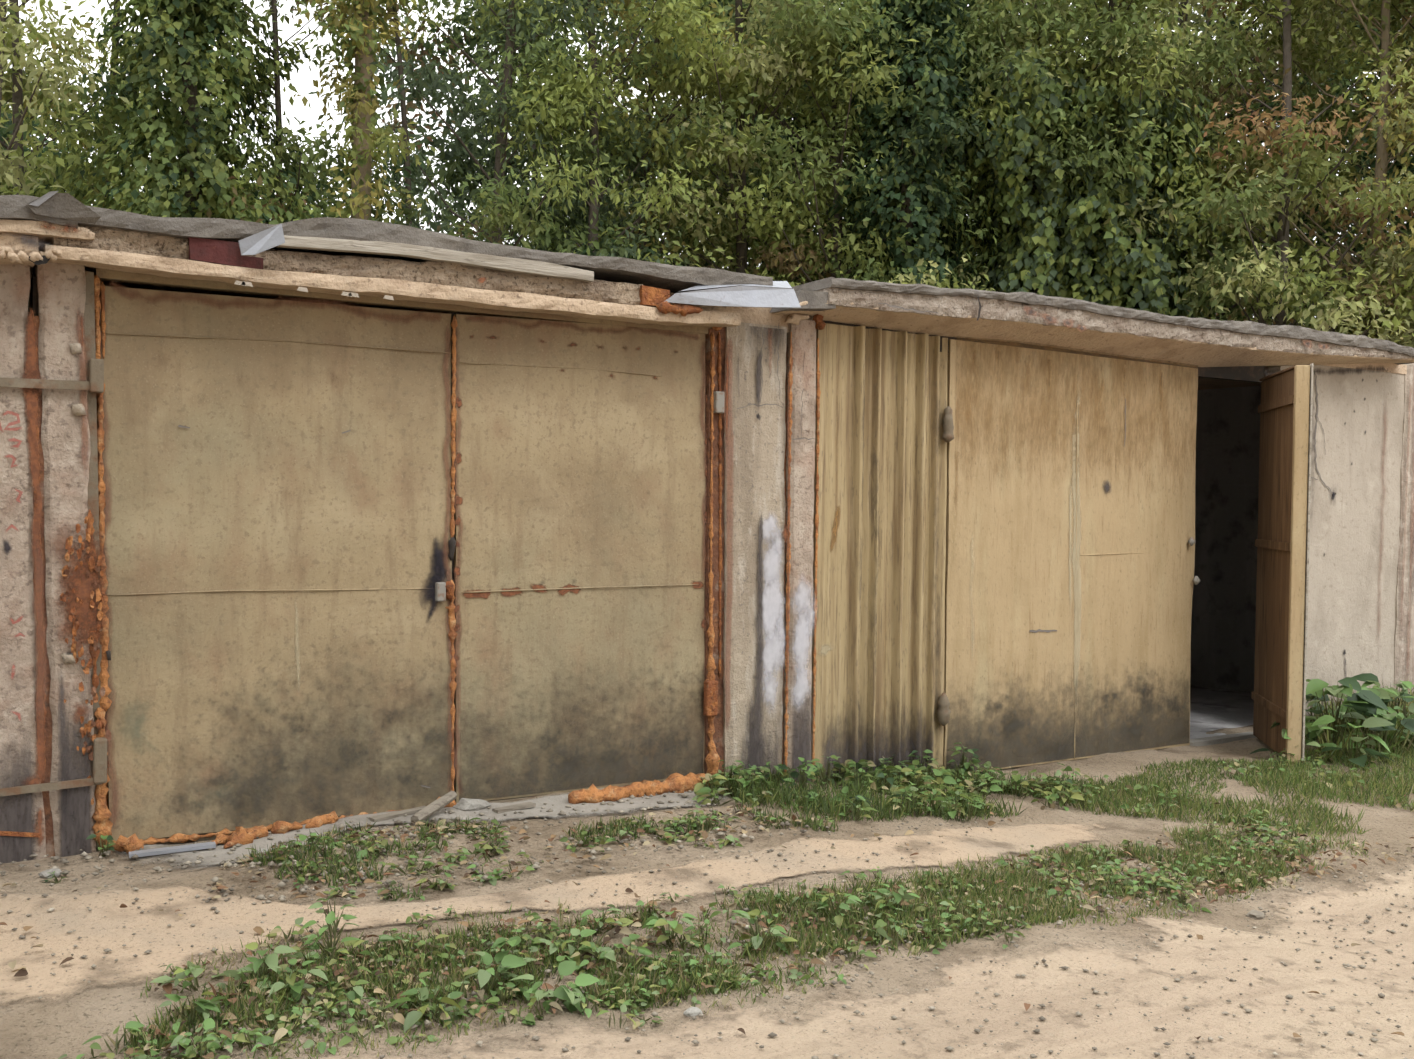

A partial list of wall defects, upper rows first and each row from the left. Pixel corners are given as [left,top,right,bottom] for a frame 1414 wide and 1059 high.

rust [22,310,117,821]
rust [112,284,707,790]
damp [468,715,704,799]
rust [725,340,733,726]
damp [751,326,784,404]
damp [742,402,1190,782]